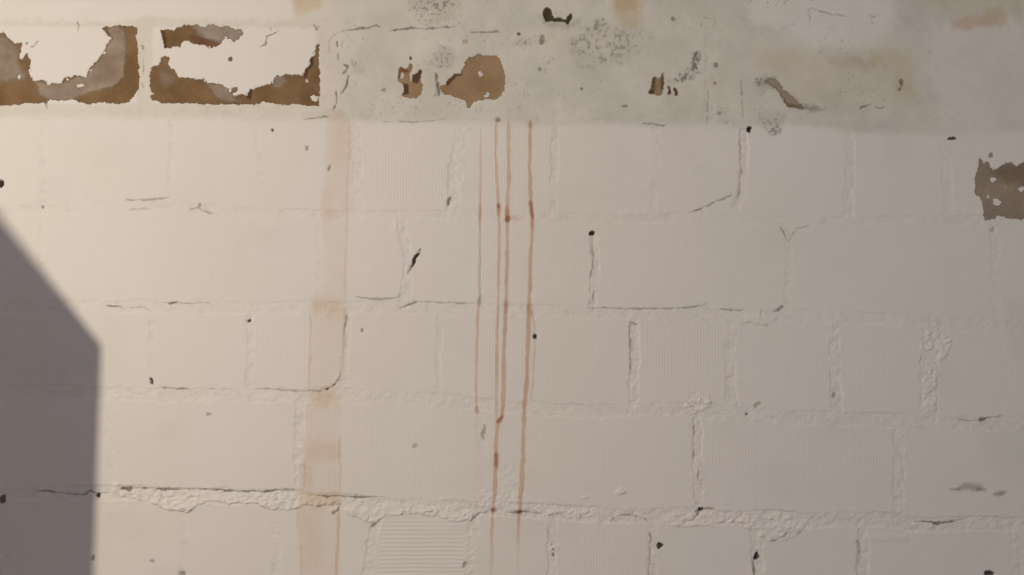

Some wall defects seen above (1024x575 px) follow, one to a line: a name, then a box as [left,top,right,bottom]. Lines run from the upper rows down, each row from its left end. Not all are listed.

spalling [543,7,572,24]
peeling [0,24,320,106]
peeling [398,64,423,99]
peeling [440,54,505,108]
peeling [648,74,678,96]
peeling [765,78,805,110]
peeling [975,158,1024,221]
crack [122,485,179,493]